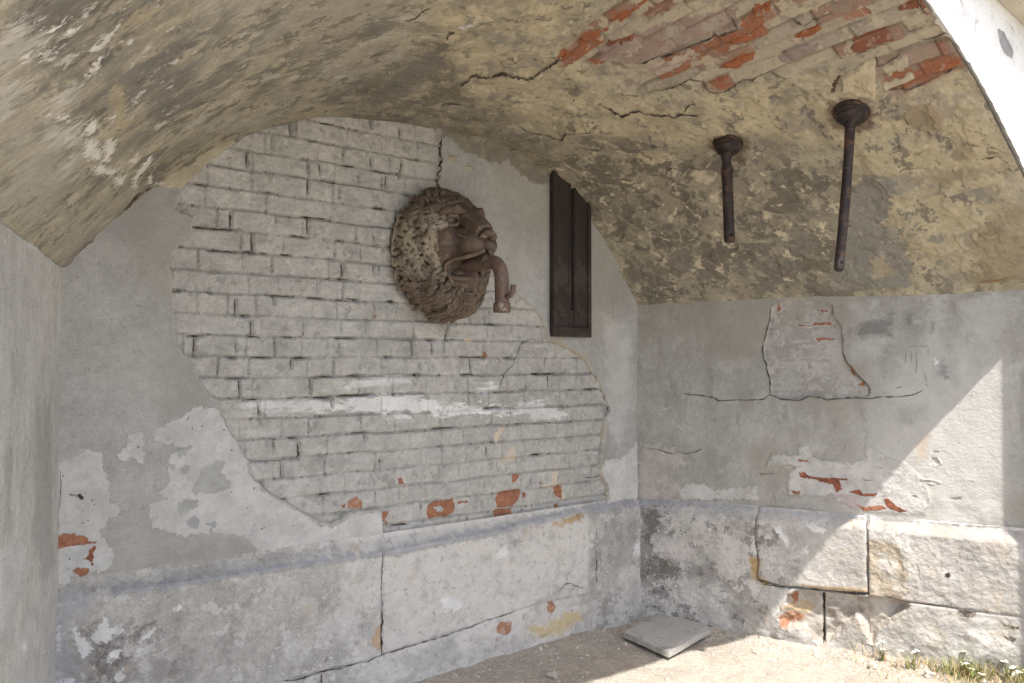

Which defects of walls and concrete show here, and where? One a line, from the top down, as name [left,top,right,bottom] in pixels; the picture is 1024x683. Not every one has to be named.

crack [443,59,573,106]
crack [520,72,791,151]
crack [435,137,443,187]
spalling [0,0,943,593]
crack [685,308,921,401]
crack [281,554,513,683]
spalling [495,619,513,637]
spalling [771,526,921,652]